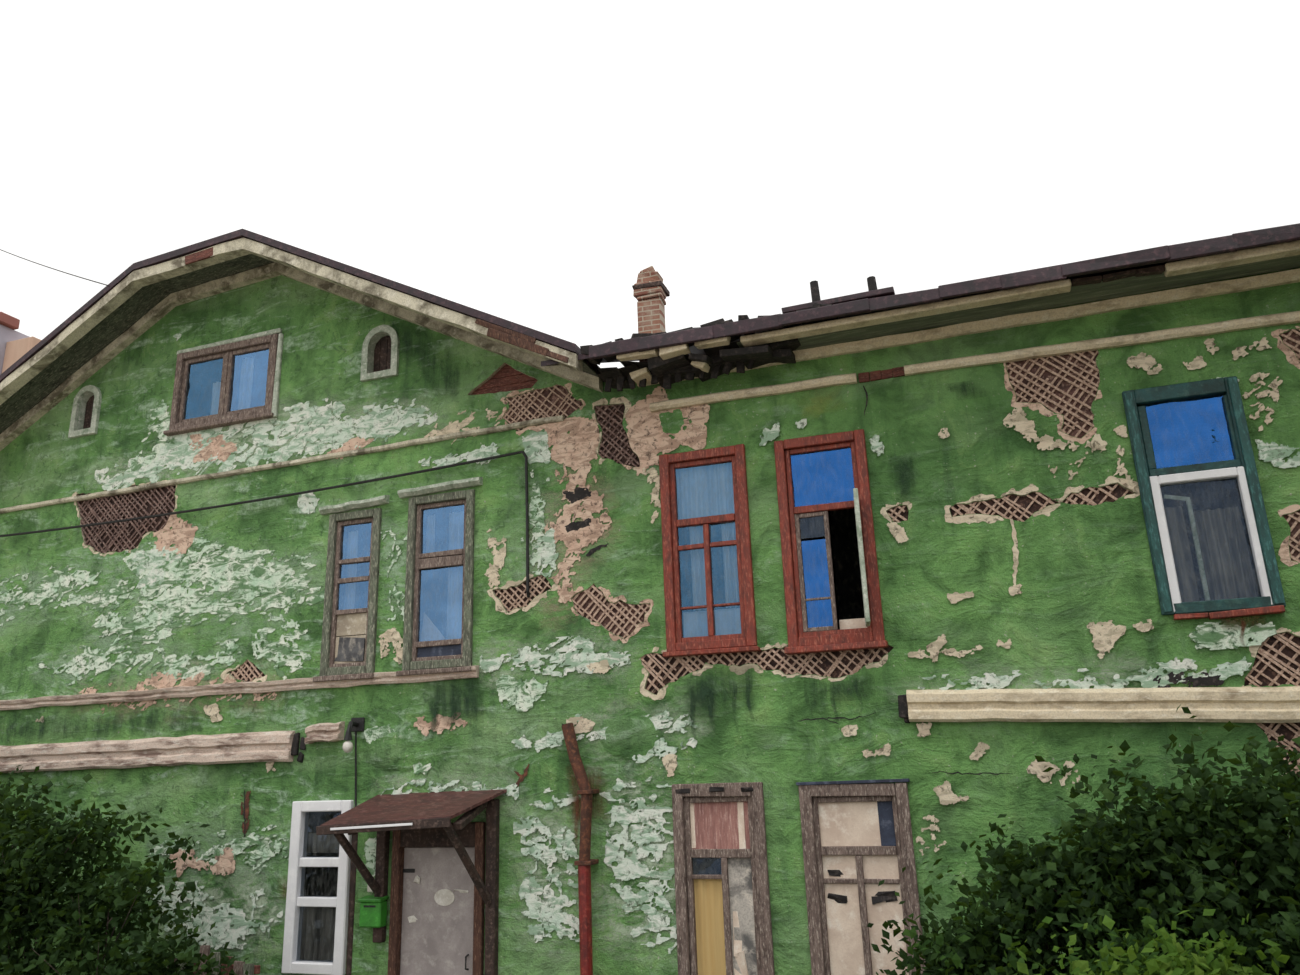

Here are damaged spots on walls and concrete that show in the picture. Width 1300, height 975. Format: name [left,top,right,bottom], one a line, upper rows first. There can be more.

spalling [1183,326,1300,370]
spalling [944,350,1140,524]
peeling [0,372,1300,954]